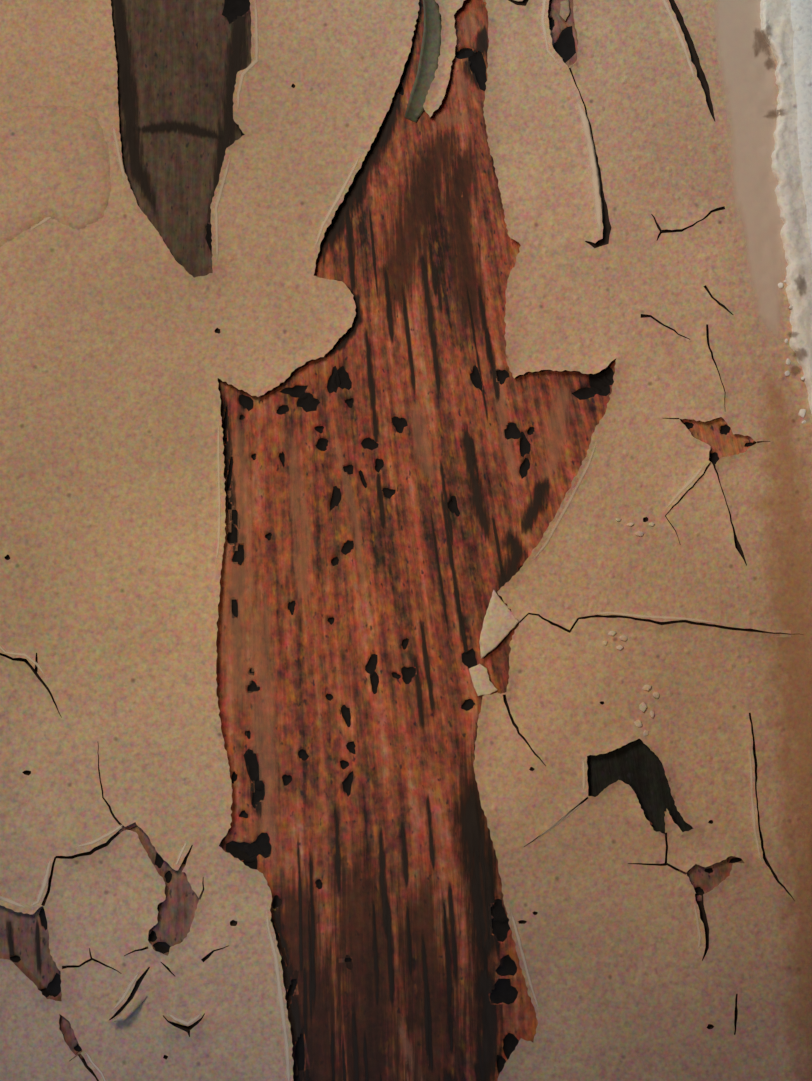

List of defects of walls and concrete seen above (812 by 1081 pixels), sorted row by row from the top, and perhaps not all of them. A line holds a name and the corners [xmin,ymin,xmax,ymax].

crack [663,0,715,121]
peeling [111,0,258,277]
crack [570,70,612,248]
peeling [678,417,760,469]
peeling [216,0,616,1081]
crack [0,646,62,718]
crack [520,612,802,635]
peeling [0,896,67,1001]
crack [32,745,137,905]
crack [63,947,205,1036]
peeling [119,822,203,956]
peeling [582,685,693,833]